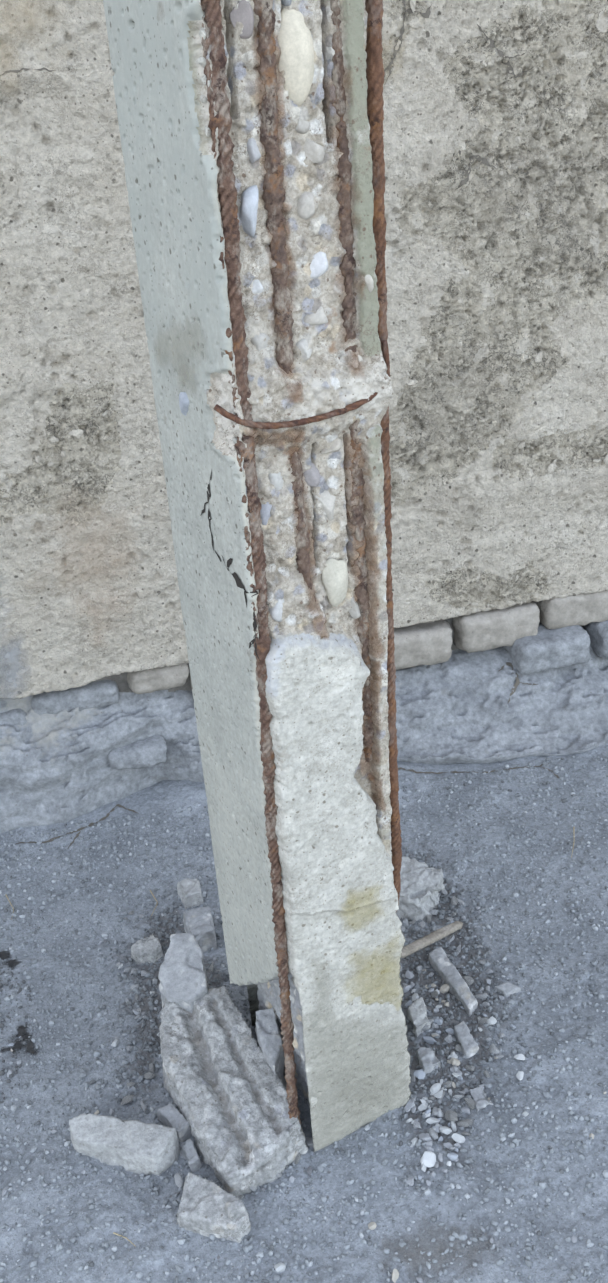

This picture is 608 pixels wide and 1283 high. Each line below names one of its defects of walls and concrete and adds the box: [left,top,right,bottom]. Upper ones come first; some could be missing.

spalling [0,375,123,526]
crack [200,469,261,664]
rust [352,524,382,799]